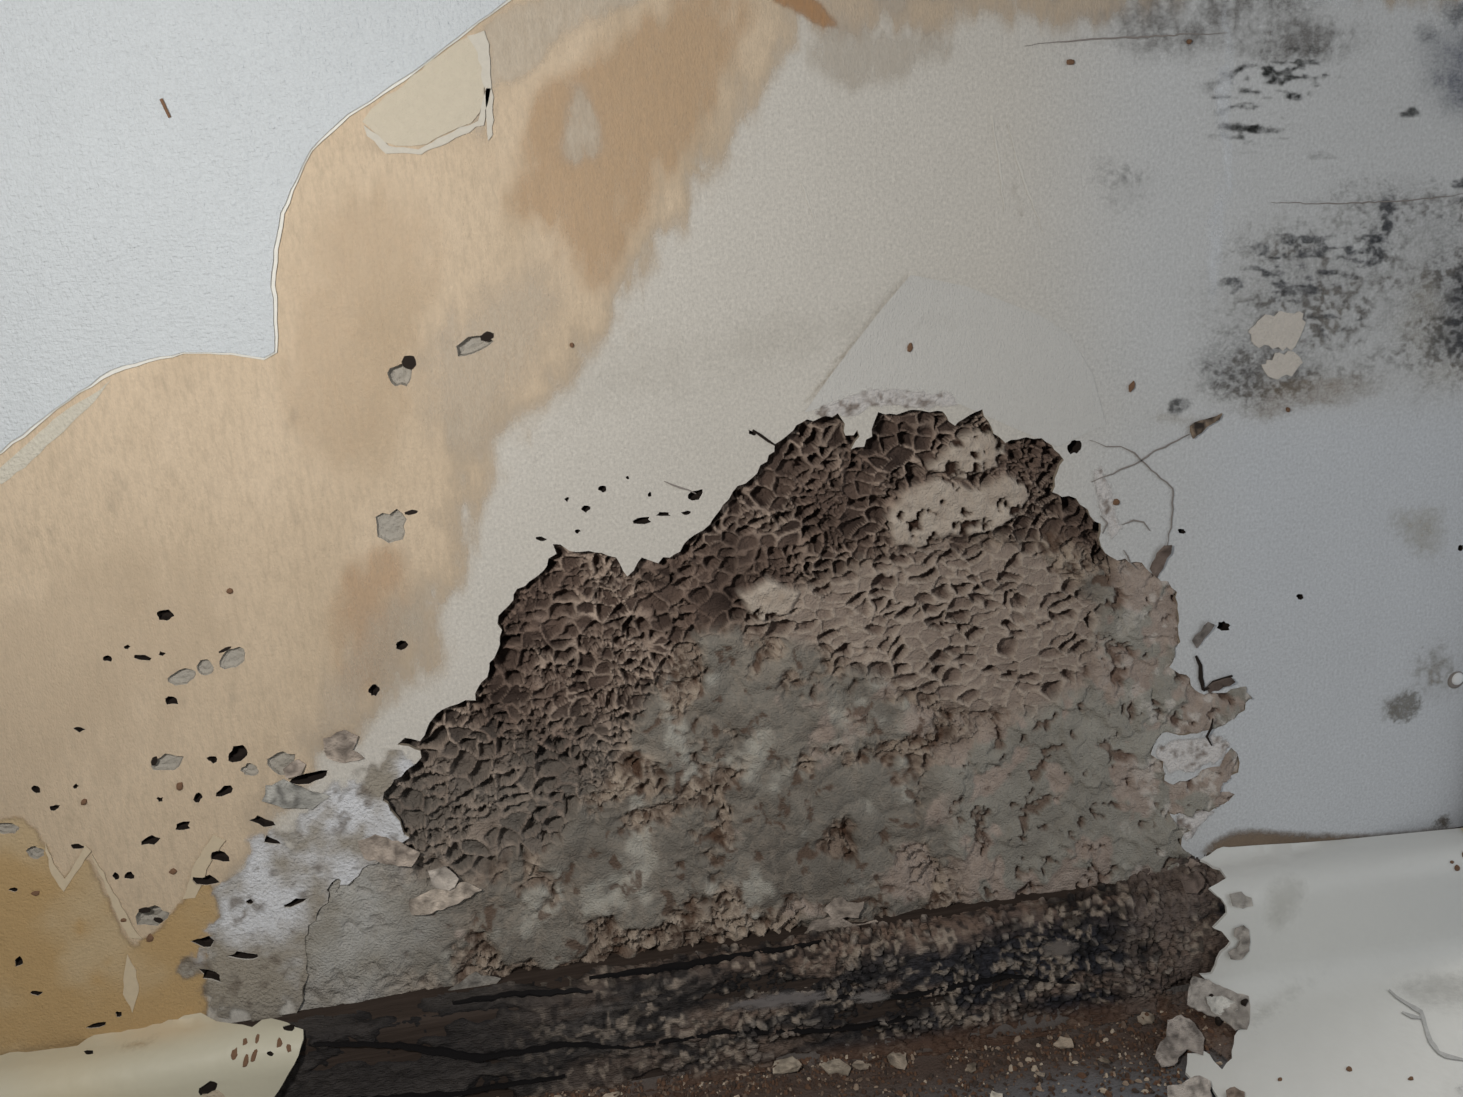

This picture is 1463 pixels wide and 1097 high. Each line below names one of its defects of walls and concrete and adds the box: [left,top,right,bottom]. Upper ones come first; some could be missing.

damp [1214,2,1333,133]
damp [1215,201,1407,398]
damp [0,0,1250,947]
crack [752,430,776,446]
crack [1090,413,1222,570]
peeling [240,751,330,810]
peeling [358,834,482,915]
crack [452,939,826,1005]
damp [298,623,1008,1011]
crack [313,973,1076,1097]
peeling [805,897,878,934]
spalling [938,545,1252,904]